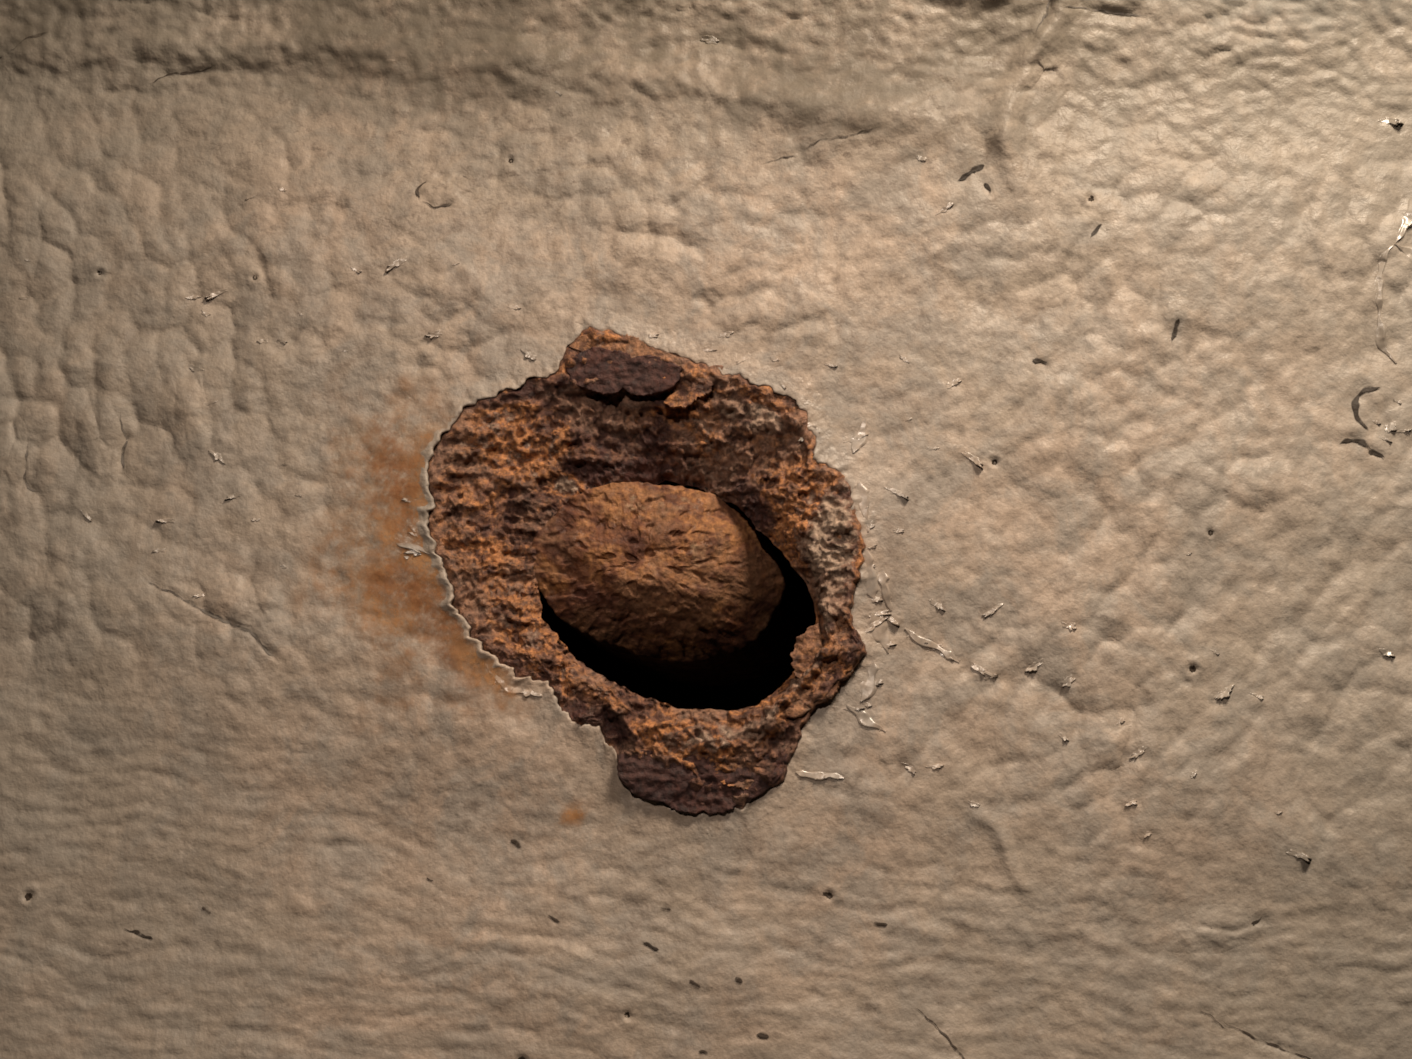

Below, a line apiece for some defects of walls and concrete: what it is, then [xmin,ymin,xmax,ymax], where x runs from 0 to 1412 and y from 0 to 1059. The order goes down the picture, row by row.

crack [149,582,278,660]
corrosion [351,327,867,815]
peeling [394,306,998,837]
crack [1201,1011,1311,1059]